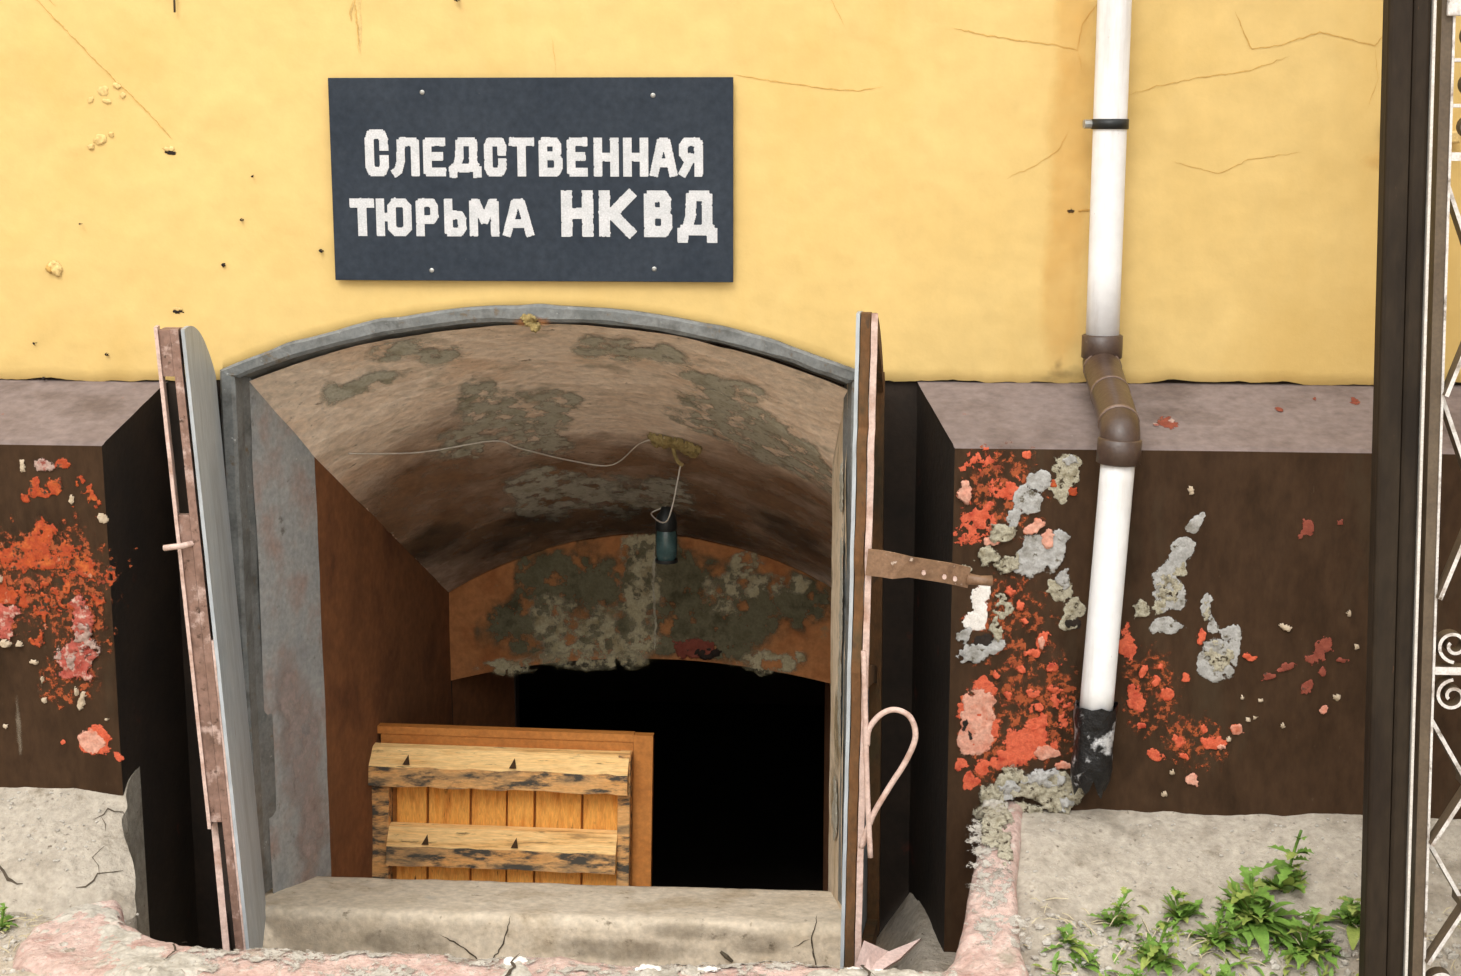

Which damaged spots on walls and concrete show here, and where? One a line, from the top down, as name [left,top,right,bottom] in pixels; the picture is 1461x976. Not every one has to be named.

crack [37,0,173,140]
crack [349,0,362,53]
crack [1130,12,1382,107]
crack [1179,152,1298,174]
leakage [323,339,461,405]
leakage [572,336,832,493]
peeling [20,457,109,524]
leakage [438,381,831,675]
peeling [0,516,117,710]
peeling [61,718,124,762]
peeling [953,447,1086,948]
flaking render [1118,512,1359,797]